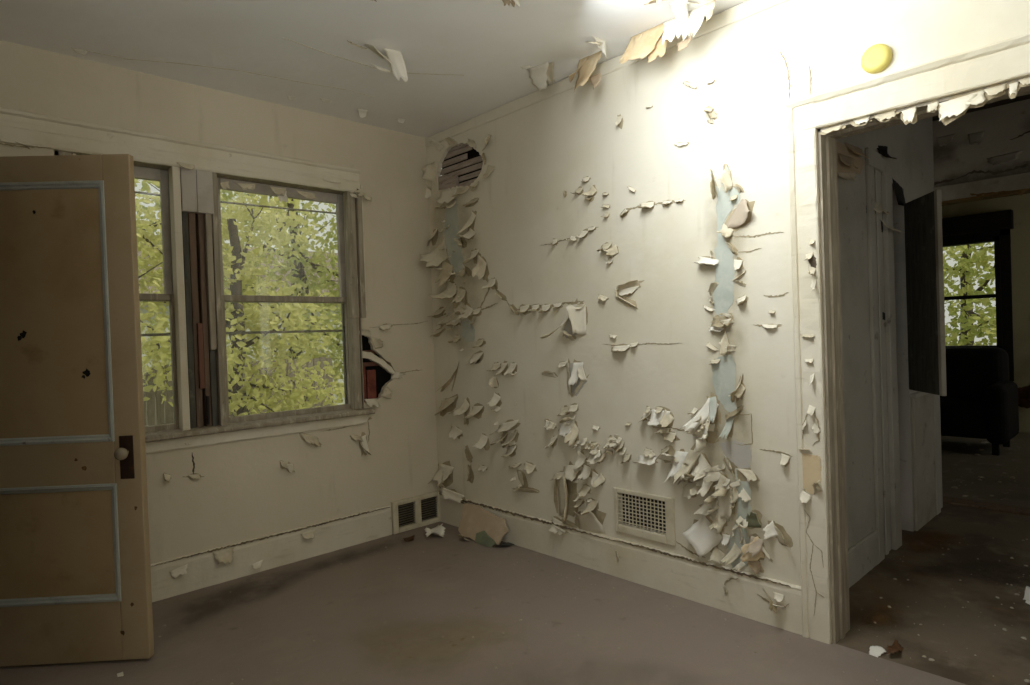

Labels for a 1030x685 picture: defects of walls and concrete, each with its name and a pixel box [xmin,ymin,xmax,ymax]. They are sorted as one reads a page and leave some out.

peeling [347,40,408,82]
peeling [521,61,555,91]
peeling [569,0,716,92]
crack [779,50,812,100]
peeling [819,77,1030,180]
peeling [420,134,540,493]
spalling [299,329,407,456]
peeling [540,164,793,596]
crack [438,486,824,614]
peeling [757,589,789,614]